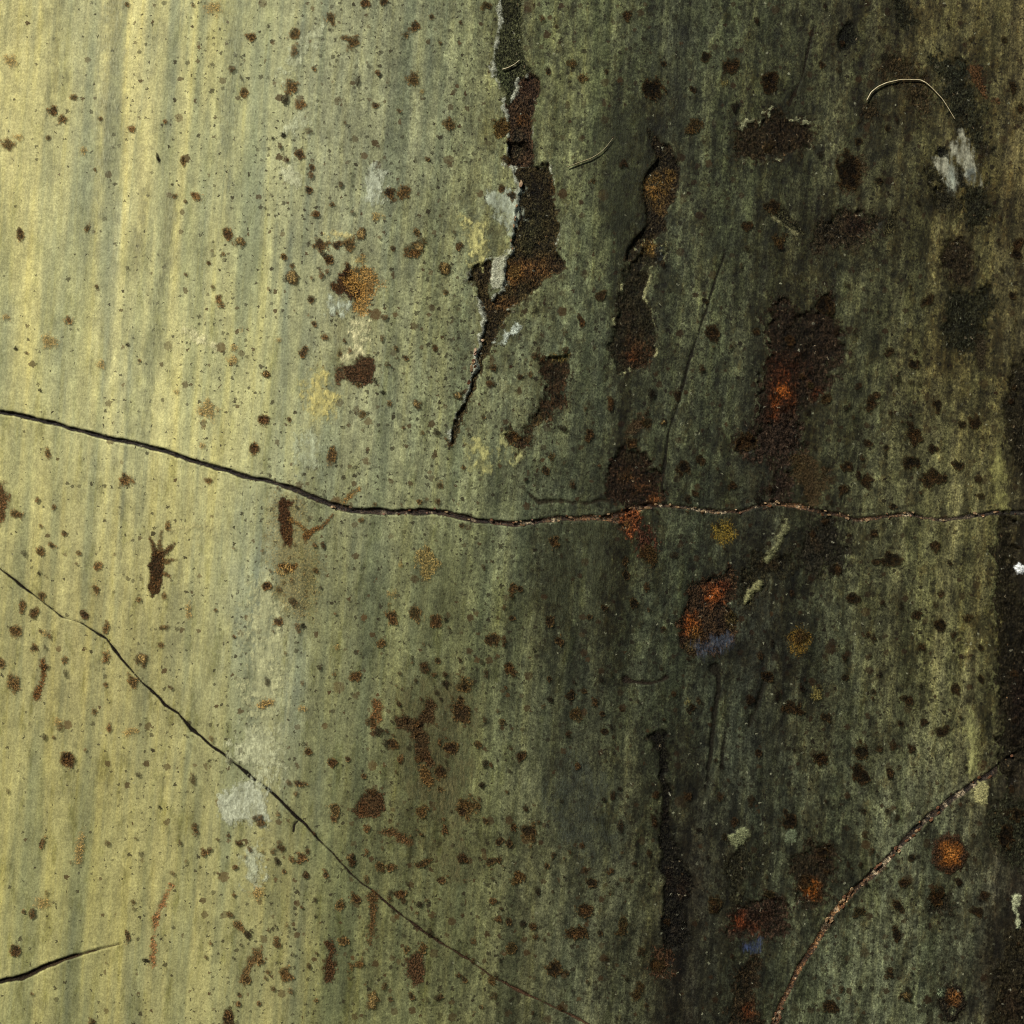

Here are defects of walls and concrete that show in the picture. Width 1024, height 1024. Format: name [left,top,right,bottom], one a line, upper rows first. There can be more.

corrosion [280,184,427,406]
spalling [448,0,567,444]
crack [0,253,1024,527]
spalling [501,347,571,461]
spalling [606,128,680,375]
corrosion [135,520,175,602]
corrosion [261,486,361,634]
corrosion [619,508,678,628]
corrosion [21,890,55,919]
crack [0,568,589,1024]
crack [771,754,1013,1024]
corrosion [927,831,990,918]